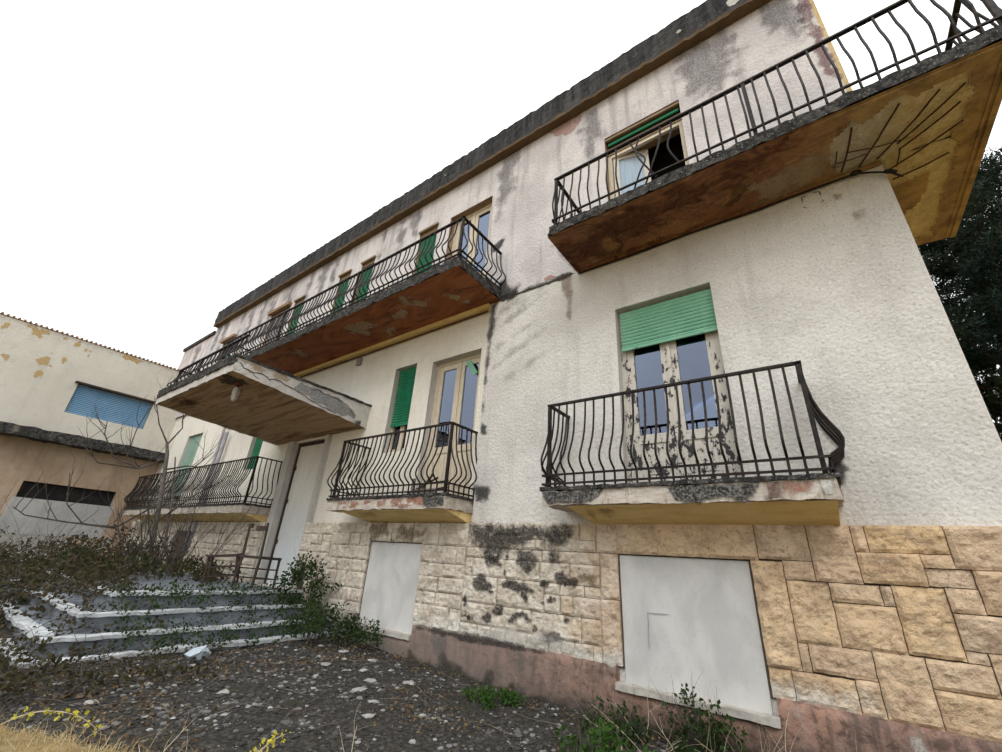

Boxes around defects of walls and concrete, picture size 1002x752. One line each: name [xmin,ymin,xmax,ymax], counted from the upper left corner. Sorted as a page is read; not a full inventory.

damp [675,30,736,93]
spalling [827,69,979,240]
damp [493,281,518,301]
crack [240,362,353,414]
damp [417,523,595,685]